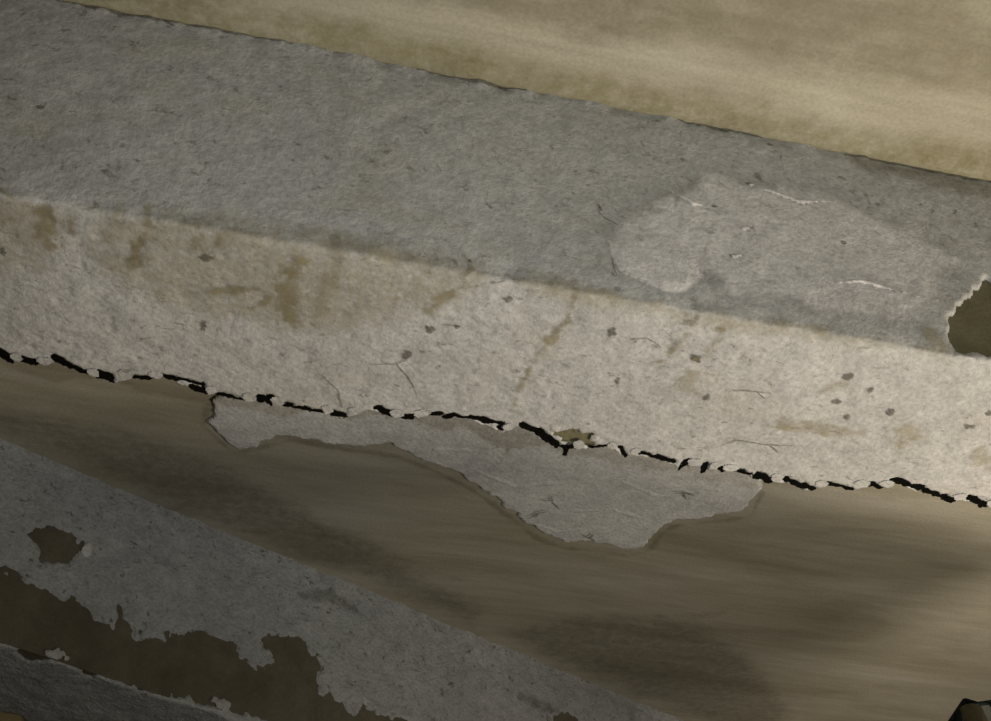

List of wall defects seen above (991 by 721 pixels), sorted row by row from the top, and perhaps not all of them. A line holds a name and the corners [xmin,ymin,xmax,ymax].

flaking render [948,280,991,360]
flaking render [0,348,991,508]
flaking render [27,525,93,564]
flaking render [0,565,408,721]
flaking render [553,712,578,721]